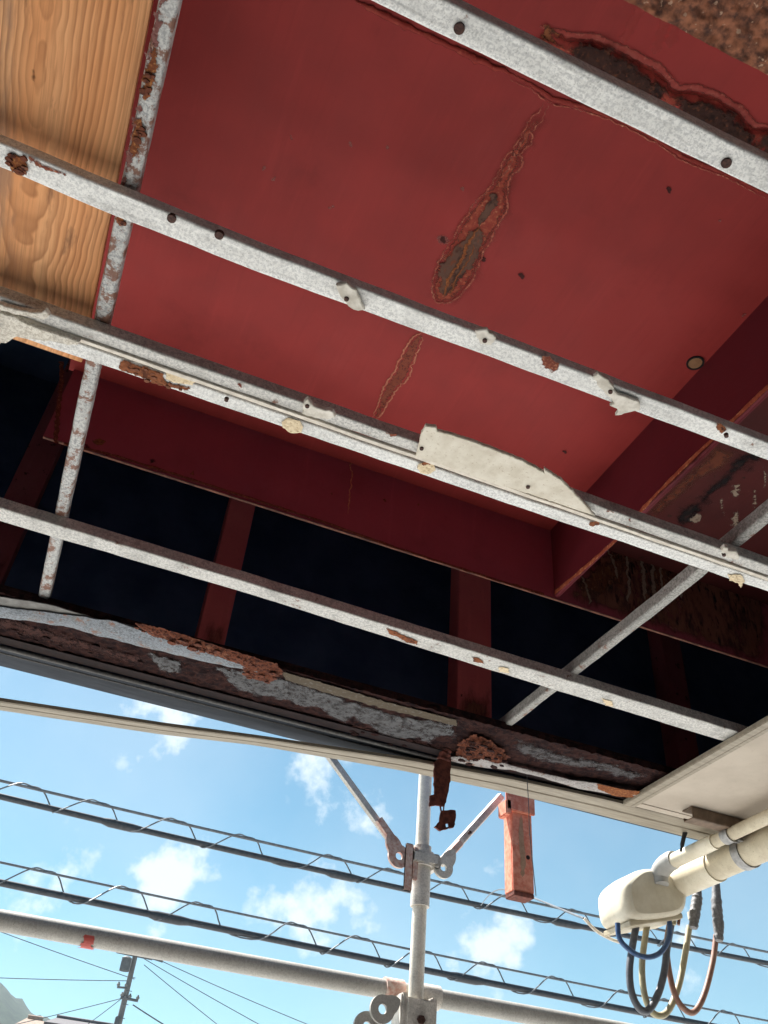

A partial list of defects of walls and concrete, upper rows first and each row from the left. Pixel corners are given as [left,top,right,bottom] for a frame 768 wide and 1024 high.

rust [120,0,168,186]
rust [5,152,66,176]
peeling [355,0,768,304]
rust [119,360,190,391]
rust [628,384,768,527]
rust [134,623,283,684]
rust [348,725,516,832]